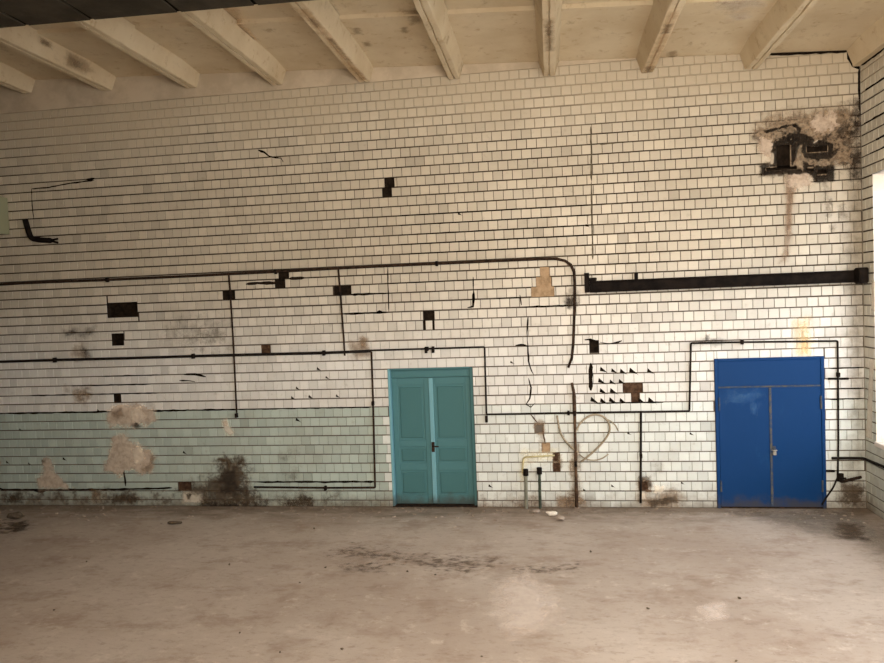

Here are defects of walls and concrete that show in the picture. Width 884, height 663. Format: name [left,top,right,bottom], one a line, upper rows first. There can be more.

spalling [754,109,854,188]
peeling [383,178,394,198]
peeling [531,267,554,297]
peeling [107,302,138,318]
peeling [590,367,654,403]
flaking render [97,394,156,474]
flaking render [28,458,67,488]